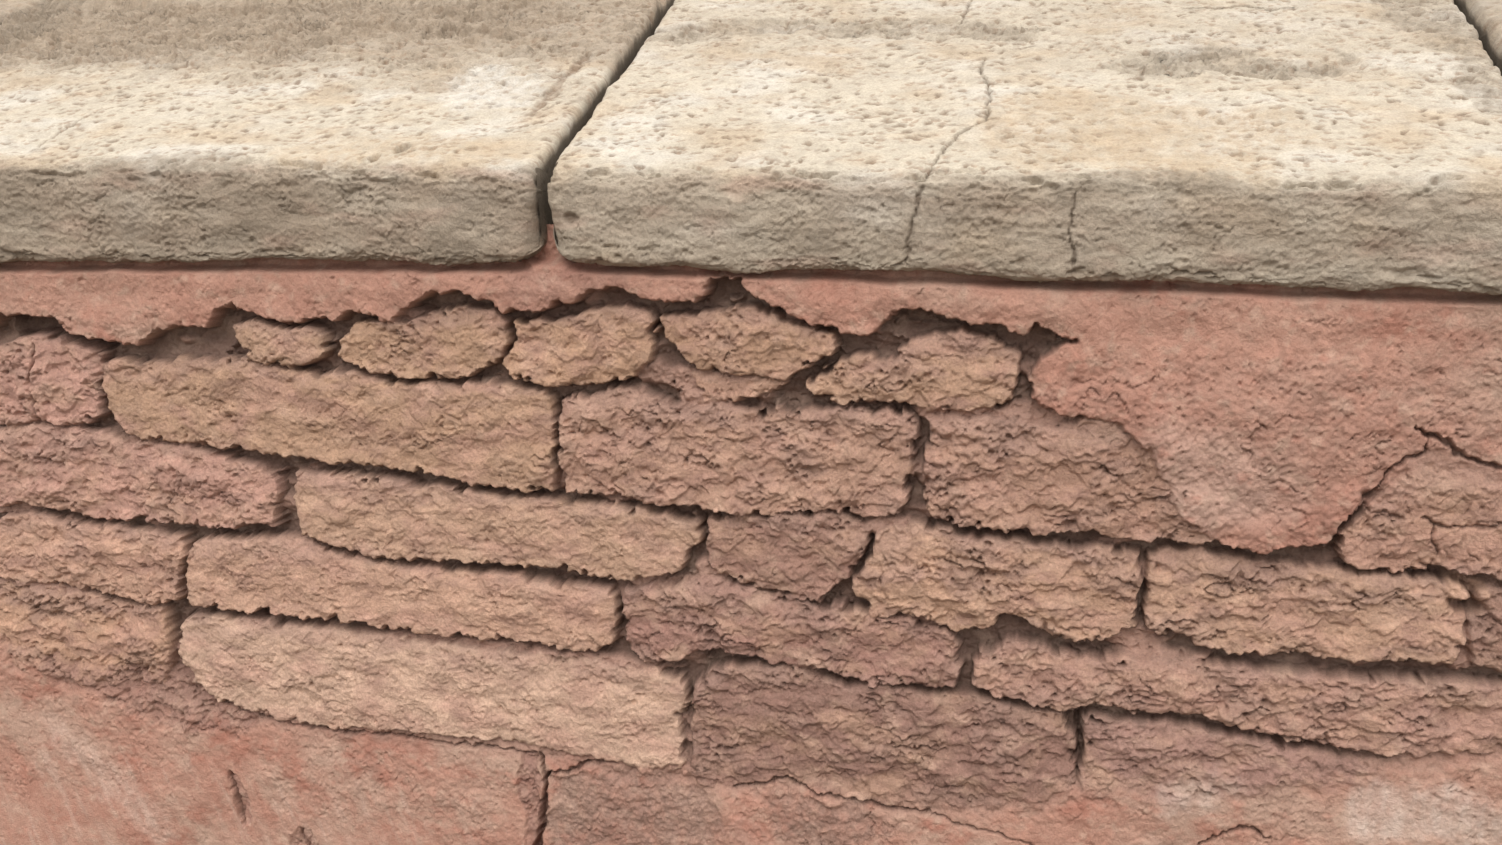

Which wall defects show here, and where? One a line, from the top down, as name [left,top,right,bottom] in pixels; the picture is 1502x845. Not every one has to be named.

crack [978,57,996,97]
crack [902,183,928,268]
crack [1066,205,1080,275]
spalling [114,307,258,360]
spalling [556,277,1077,606]
spalling [136,442,456,538]
spalling [38,597,298,740]
spalling [360,617,746,686]
spalling [958,528,1502,684]
crack [228,769,253,828]
crack [257,711,613,845]
spalling [315,704,1080,845]